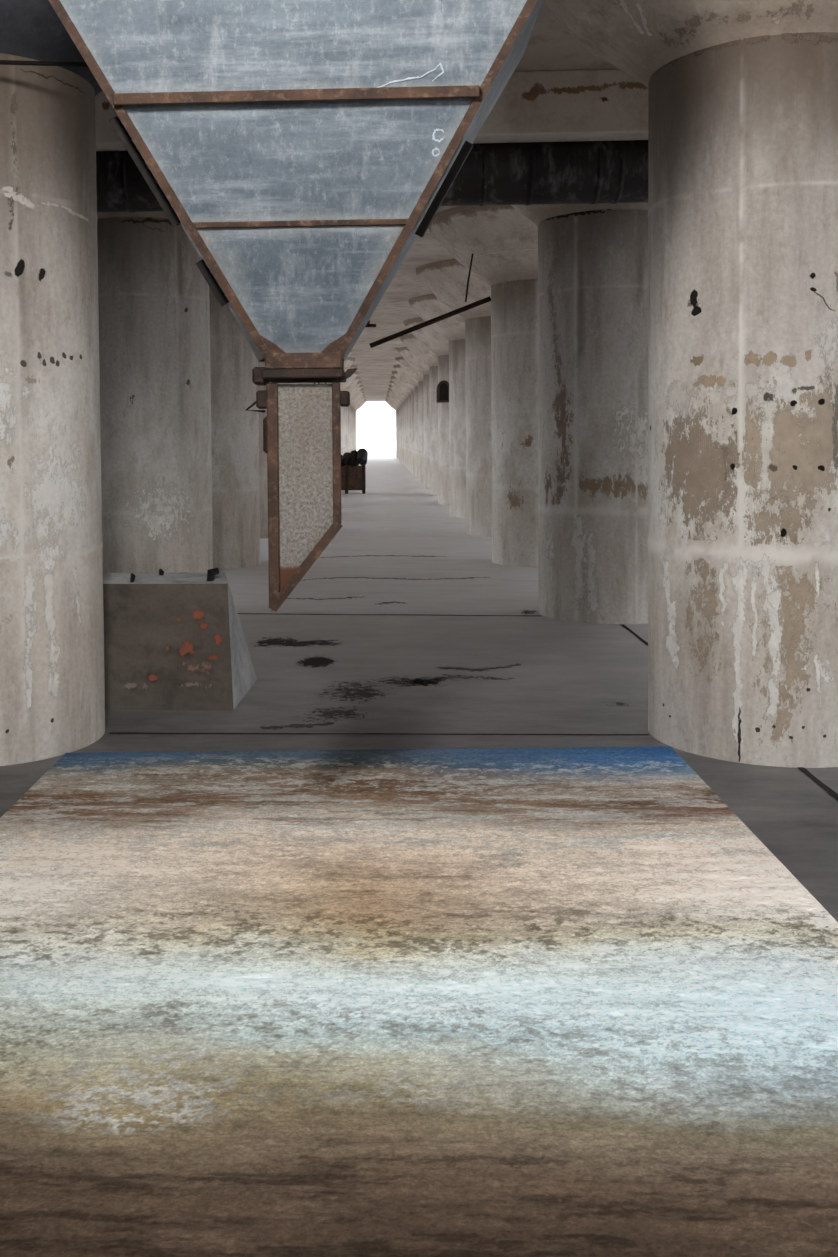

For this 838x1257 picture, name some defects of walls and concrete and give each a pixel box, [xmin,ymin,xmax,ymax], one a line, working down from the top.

peeling [20,352,82,384]
peeling [659,351,838,545]
damp [303,663,521,724]